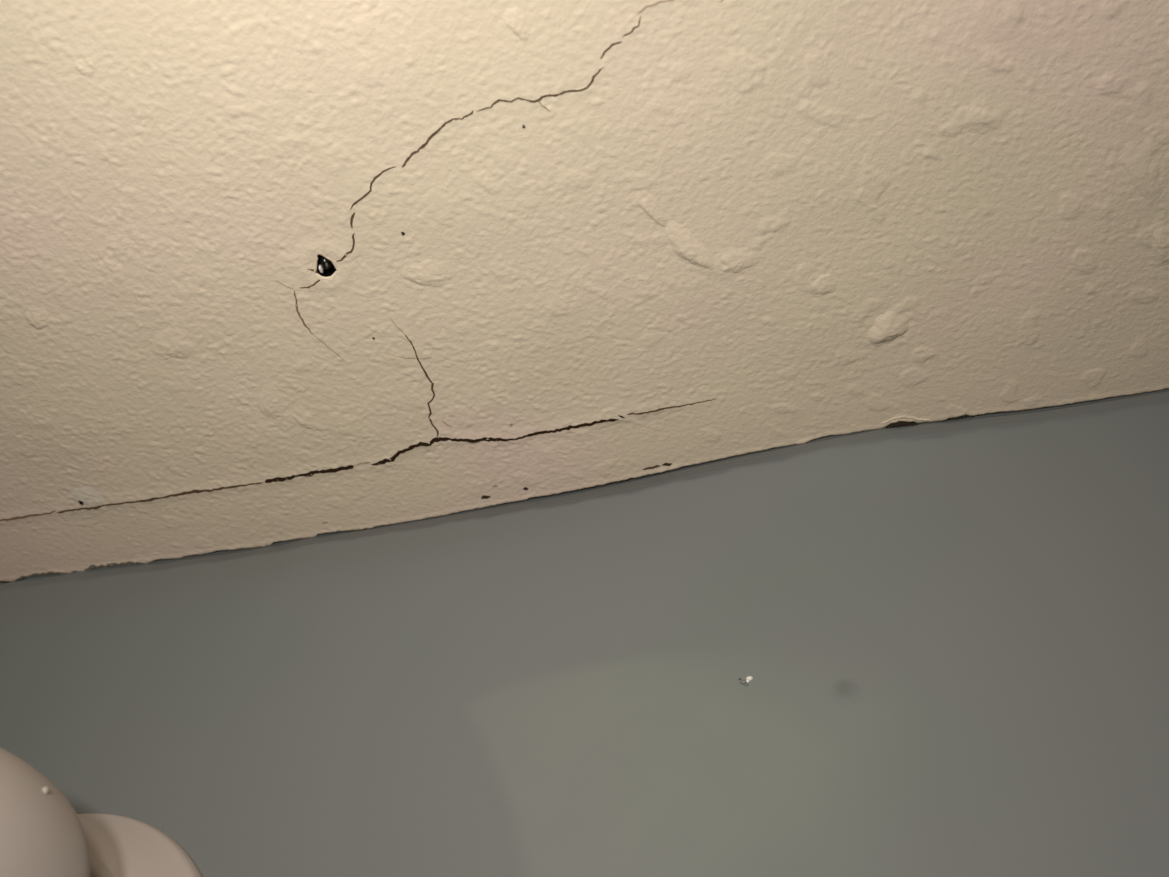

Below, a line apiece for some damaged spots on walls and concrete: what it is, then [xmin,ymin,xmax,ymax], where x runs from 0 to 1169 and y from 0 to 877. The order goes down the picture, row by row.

crack [277,0,673,360]
crack [0,318,713,521]